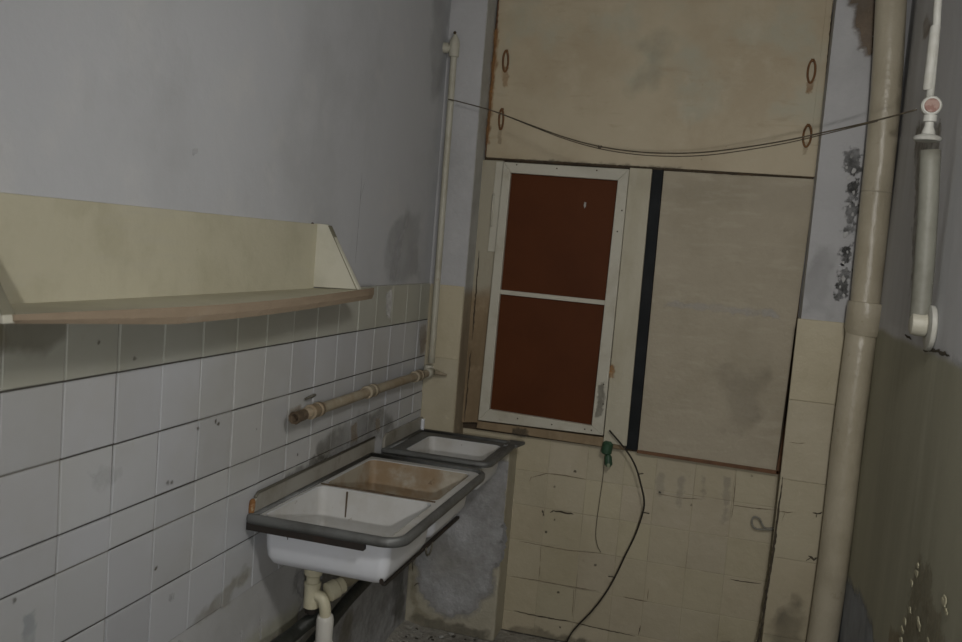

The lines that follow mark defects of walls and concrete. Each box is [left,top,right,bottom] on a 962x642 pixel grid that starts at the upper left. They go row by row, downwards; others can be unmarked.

peeling [849,0,875,56]
peeling [296,569,306,620]
peeling [320,461,509,642]
crack [731,470,791,642]